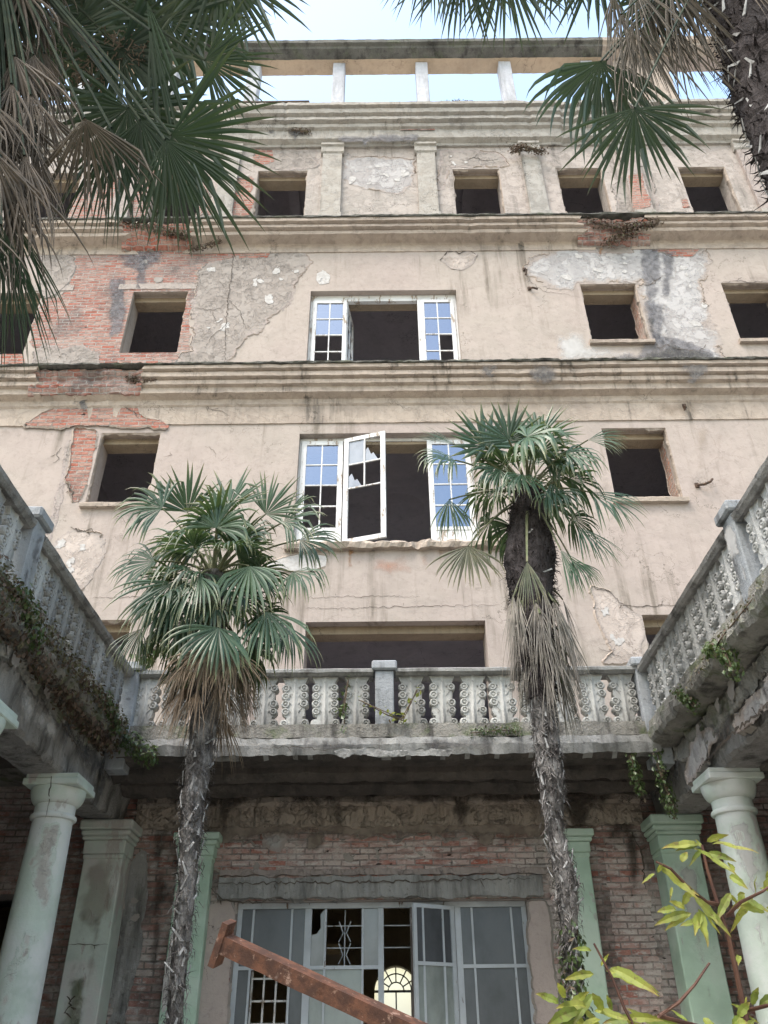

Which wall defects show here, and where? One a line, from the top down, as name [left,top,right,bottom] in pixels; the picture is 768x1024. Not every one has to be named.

peeling [341,156,417,195]
spalling [611,166,660,213]
spalling [0,250,330,364]
peeling [522,245,726,358]
water stain [562,249,712,383]
spalling [23,407,169,502]
spalling [53,528,106,591]
spalling [588,585,645,666]
spalling [672,646,768,787]